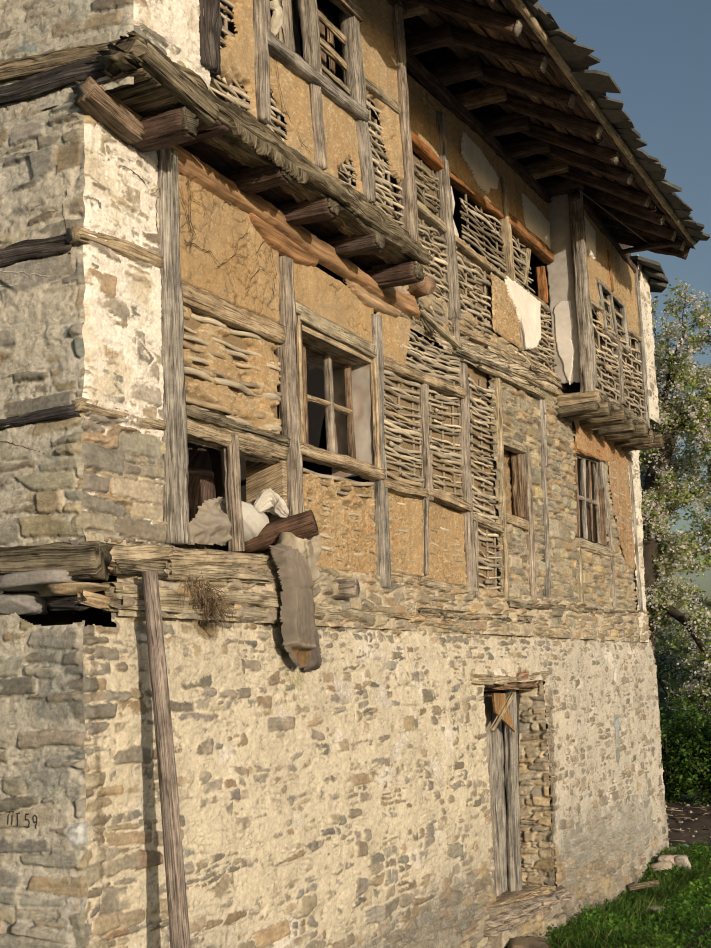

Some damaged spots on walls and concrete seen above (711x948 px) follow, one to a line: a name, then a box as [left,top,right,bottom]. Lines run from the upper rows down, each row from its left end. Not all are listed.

spalling [220,0,235,49]
spalling [209,75,251,110]
spalling [265,89,288,140]
spalling [337,158,357,189]
spalling [366,98,404,227]
peeling [461,132,499,194]
crack [121,162,277,296]
peeling [521,193,551,249]
peeling [504,276,541,350]